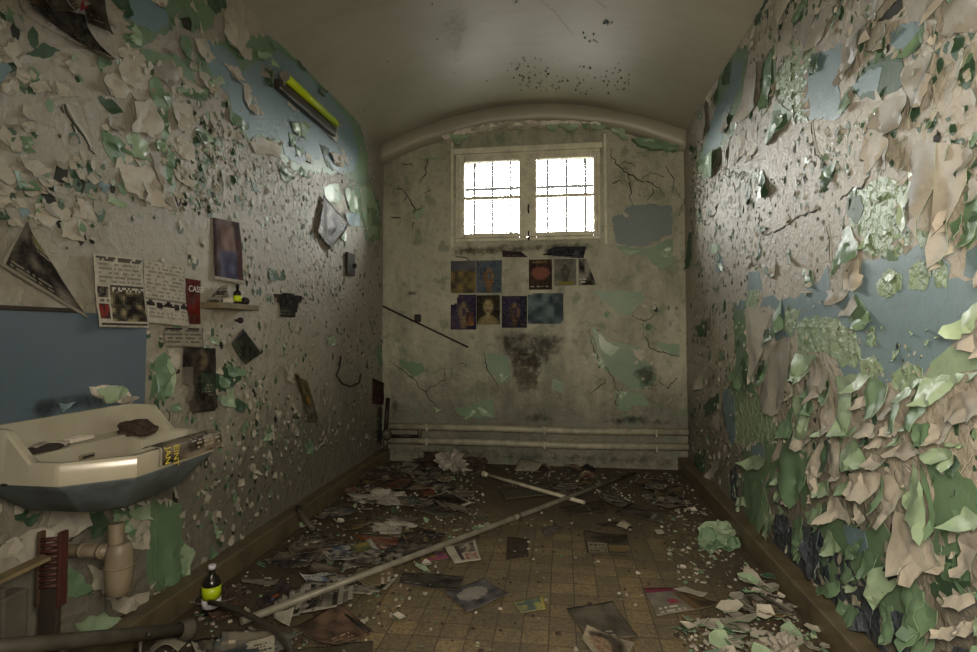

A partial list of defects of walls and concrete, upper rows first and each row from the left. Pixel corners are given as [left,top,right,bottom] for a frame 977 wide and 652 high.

peeling [0,0,445,631]
damp [504,334,555,386]
peeling [507,57,630,95]
peeling [589,0,977,652]